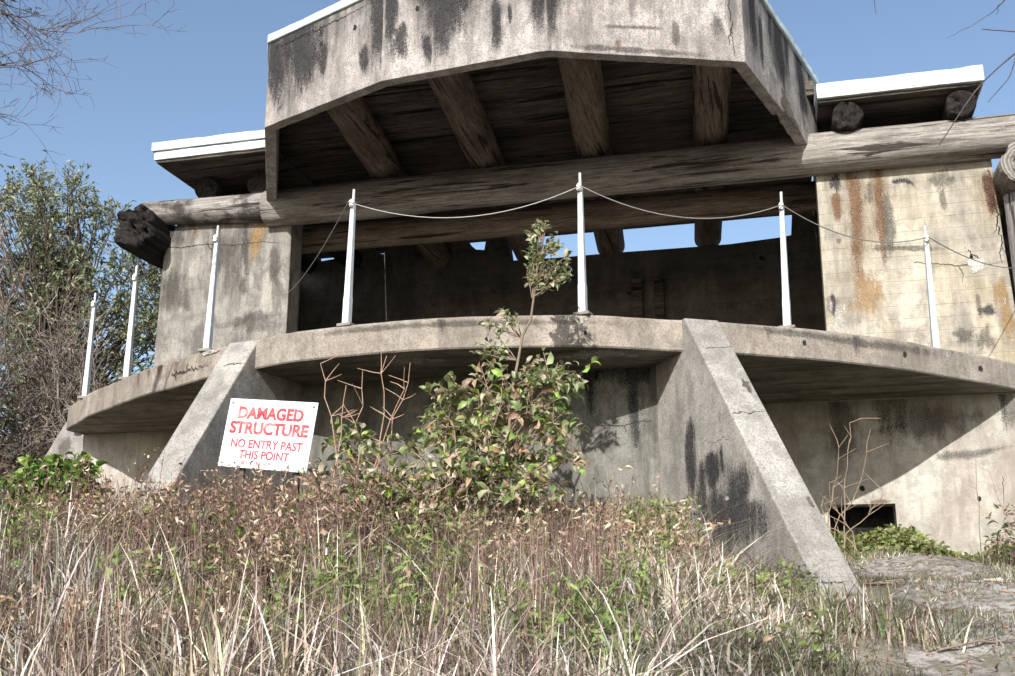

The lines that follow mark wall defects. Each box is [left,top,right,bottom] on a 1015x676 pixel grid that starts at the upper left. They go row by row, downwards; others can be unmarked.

leakage [359,0,407,71]
leakage [422,0,472,61]
leakage [492,0,512,47]
leakage [532,0,560,31]
leakage [584,22,679,55]
rust [832,172,884,313]
rust [875,169,886,260]
rust [982,170,997,215]
rust [993,279,1015,334]
leakage [685,417,768,556]